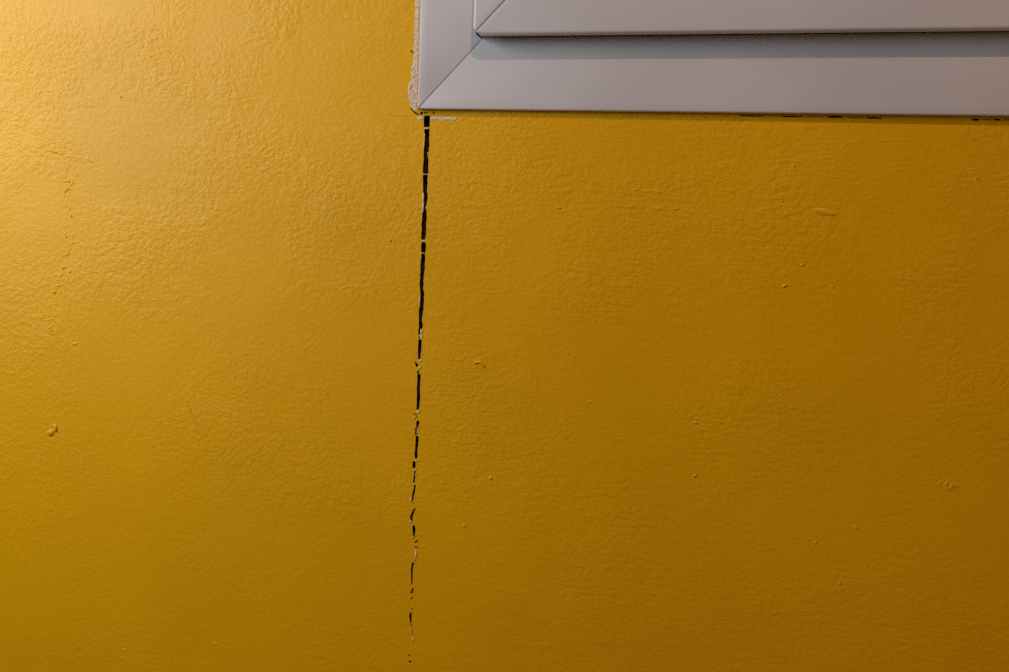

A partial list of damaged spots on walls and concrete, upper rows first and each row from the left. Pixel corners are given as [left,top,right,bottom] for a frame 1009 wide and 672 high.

crack [408,108,435,662]